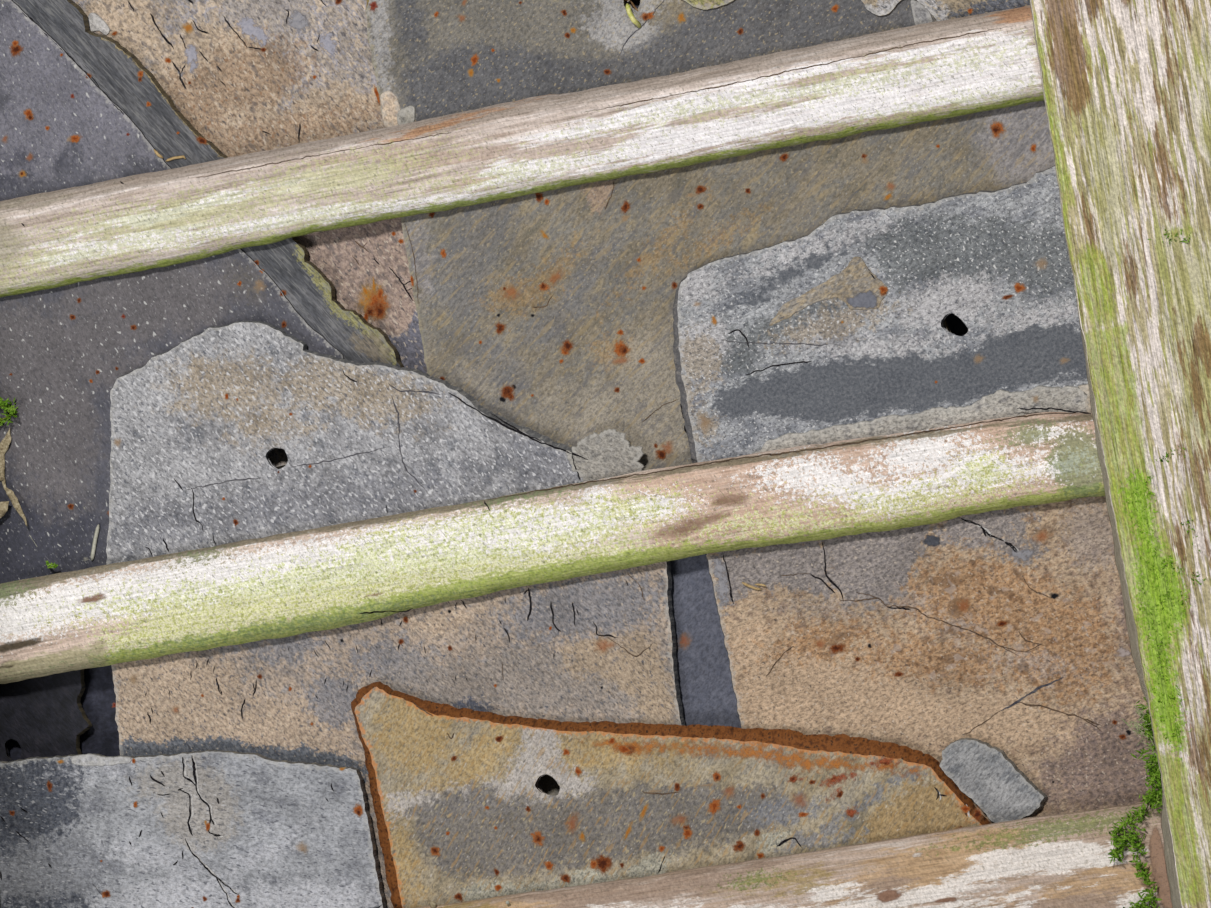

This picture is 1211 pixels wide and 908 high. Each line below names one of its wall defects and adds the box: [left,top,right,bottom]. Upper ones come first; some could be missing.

corrosion [560,340,573,363]
corrosion [614,330,645,364]
corrosion [501,386,514,401]
crack [961,518,1050,598]
crack [781,542,1043,654]
corrosion [829,644,860,661]
crack [962,677,1102,735]
corrosion [595,738,894,817]
crack [129,757,239,908]
corrosion [733,829,765,859]
corrosion [544,861,570,883]
corrosion [590,855,624,873]